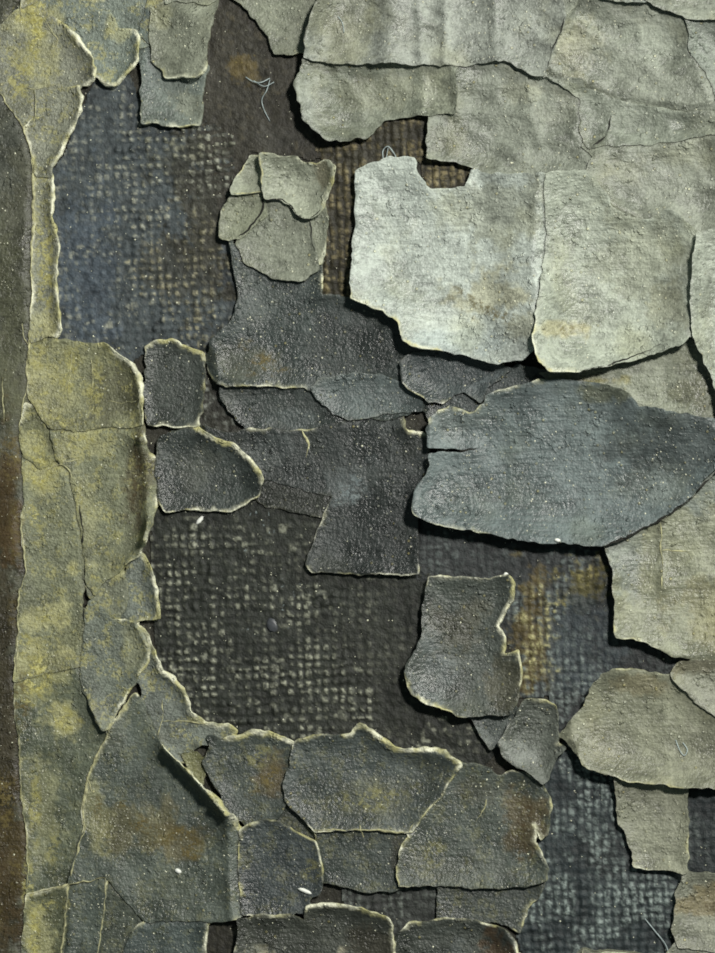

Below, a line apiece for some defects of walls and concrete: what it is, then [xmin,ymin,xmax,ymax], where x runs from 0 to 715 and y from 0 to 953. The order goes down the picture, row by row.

crack [546,17,565,70]
crack [15,512,27,674]
water stain [16,635,51,708]
peeling [0,0,340,953]
peeling [14,378,715,953]
crack [17,695,133,953]